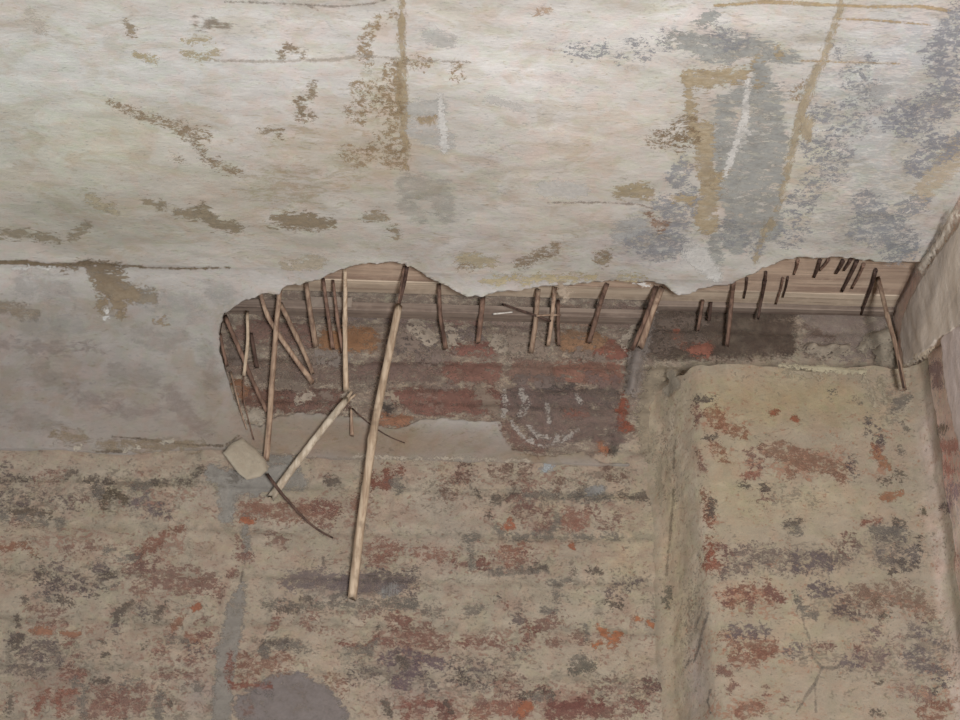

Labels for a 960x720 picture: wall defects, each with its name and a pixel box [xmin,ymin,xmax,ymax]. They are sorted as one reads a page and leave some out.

damp [339,0,432,170]
damp [753,0,843,262]
spalling [221,313,654,572]